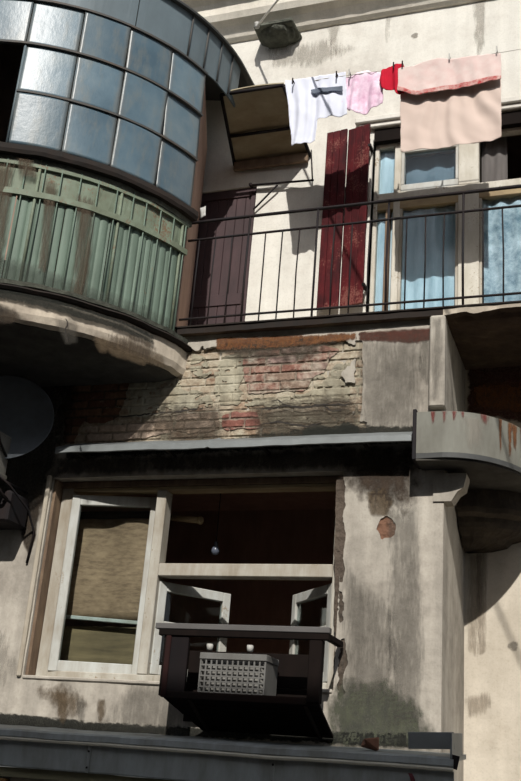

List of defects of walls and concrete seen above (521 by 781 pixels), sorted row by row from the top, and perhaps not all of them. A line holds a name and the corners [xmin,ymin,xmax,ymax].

corrosion [0,163,14,259]
corrosion [39,181,57,270]
corrosion [71,196,93,299]
leakage [0,385,416,551]
flaking render [62,340,367,446]
corrosion [499,419,521,455]
flaking render [377,516,396,540]
flaking render [332,475,348,694]
leakage [0,688,408,747]